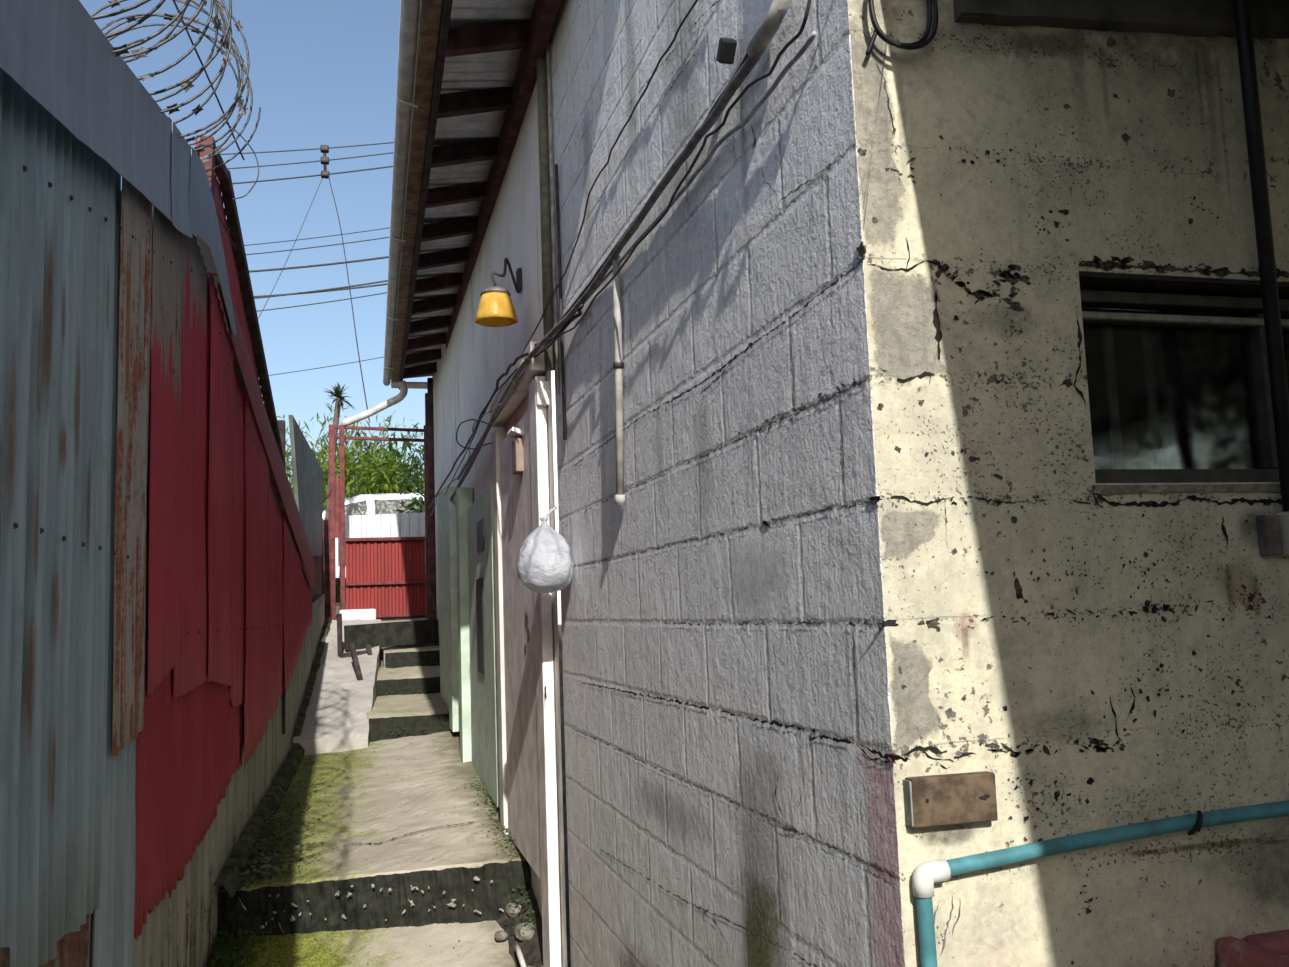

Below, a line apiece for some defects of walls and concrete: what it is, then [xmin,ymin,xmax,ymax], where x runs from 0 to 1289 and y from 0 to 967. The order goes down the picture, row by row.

crack [1078,261,1289,279]
corrosion [37,251,65,430]
corrosion [62,353,80,462]
crack [573,238,1032,567]
crack [1067,314,1086,407]
crack [1068,489,1282,549]
corrosion [38,914,91,967]